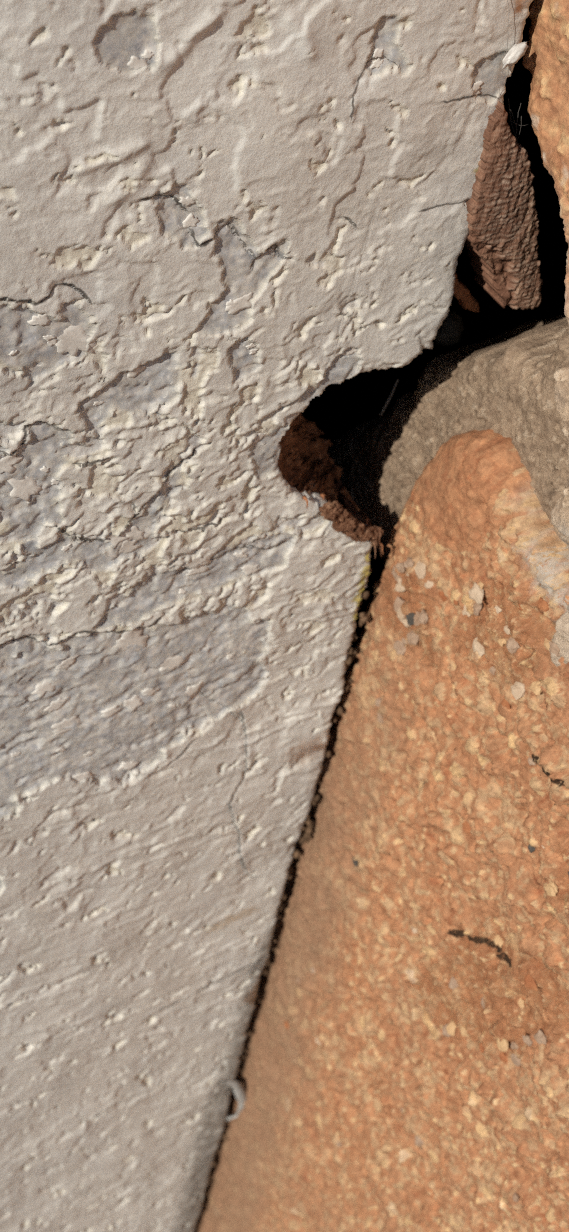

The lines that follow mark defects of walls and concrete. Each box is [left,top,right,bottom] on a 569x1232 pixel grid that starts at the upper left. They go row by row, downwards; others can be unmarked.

peeling [367,17,407,73]
crack [142,195,288,269]
peeling [155,187,287,332]
crack [0,283,91,305]
peeling [306,348,358,400]
crack [0,421,70,456]
peeling [252,431,284,476]
spalling [391,557,434,655]
spalling [453,581,520,657]
spalling [511,681,542,700]
crack [186,681,258,878]
spalling [479,1029,547,1066]